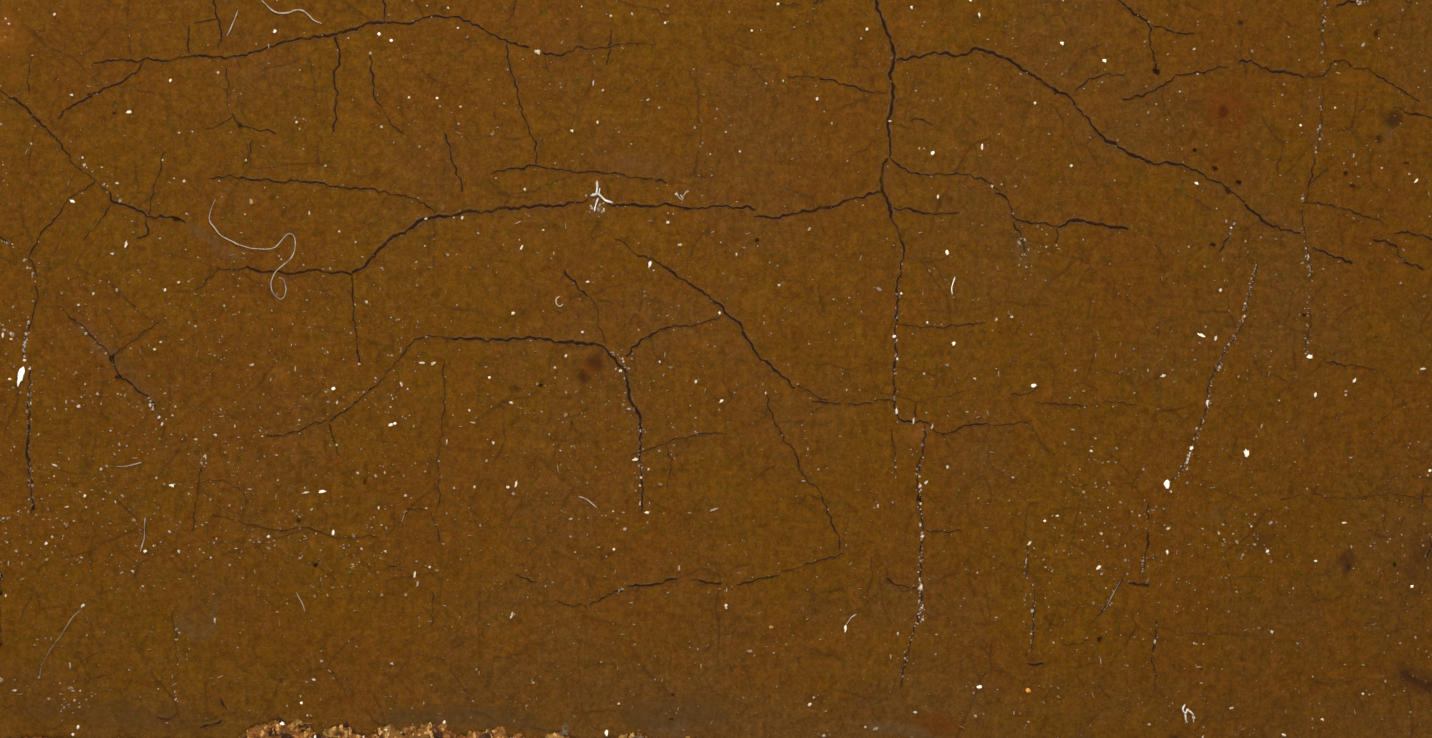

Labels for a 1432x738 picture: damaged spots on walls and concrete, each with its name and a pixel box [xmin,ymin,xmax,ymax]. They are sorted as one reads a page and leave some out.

crack [1118,0,1432,118]
crack [0,0,667,522]
crack [1374,231,1432,270]
crack [266,0,1378,683]
crack [193,456,396,567]